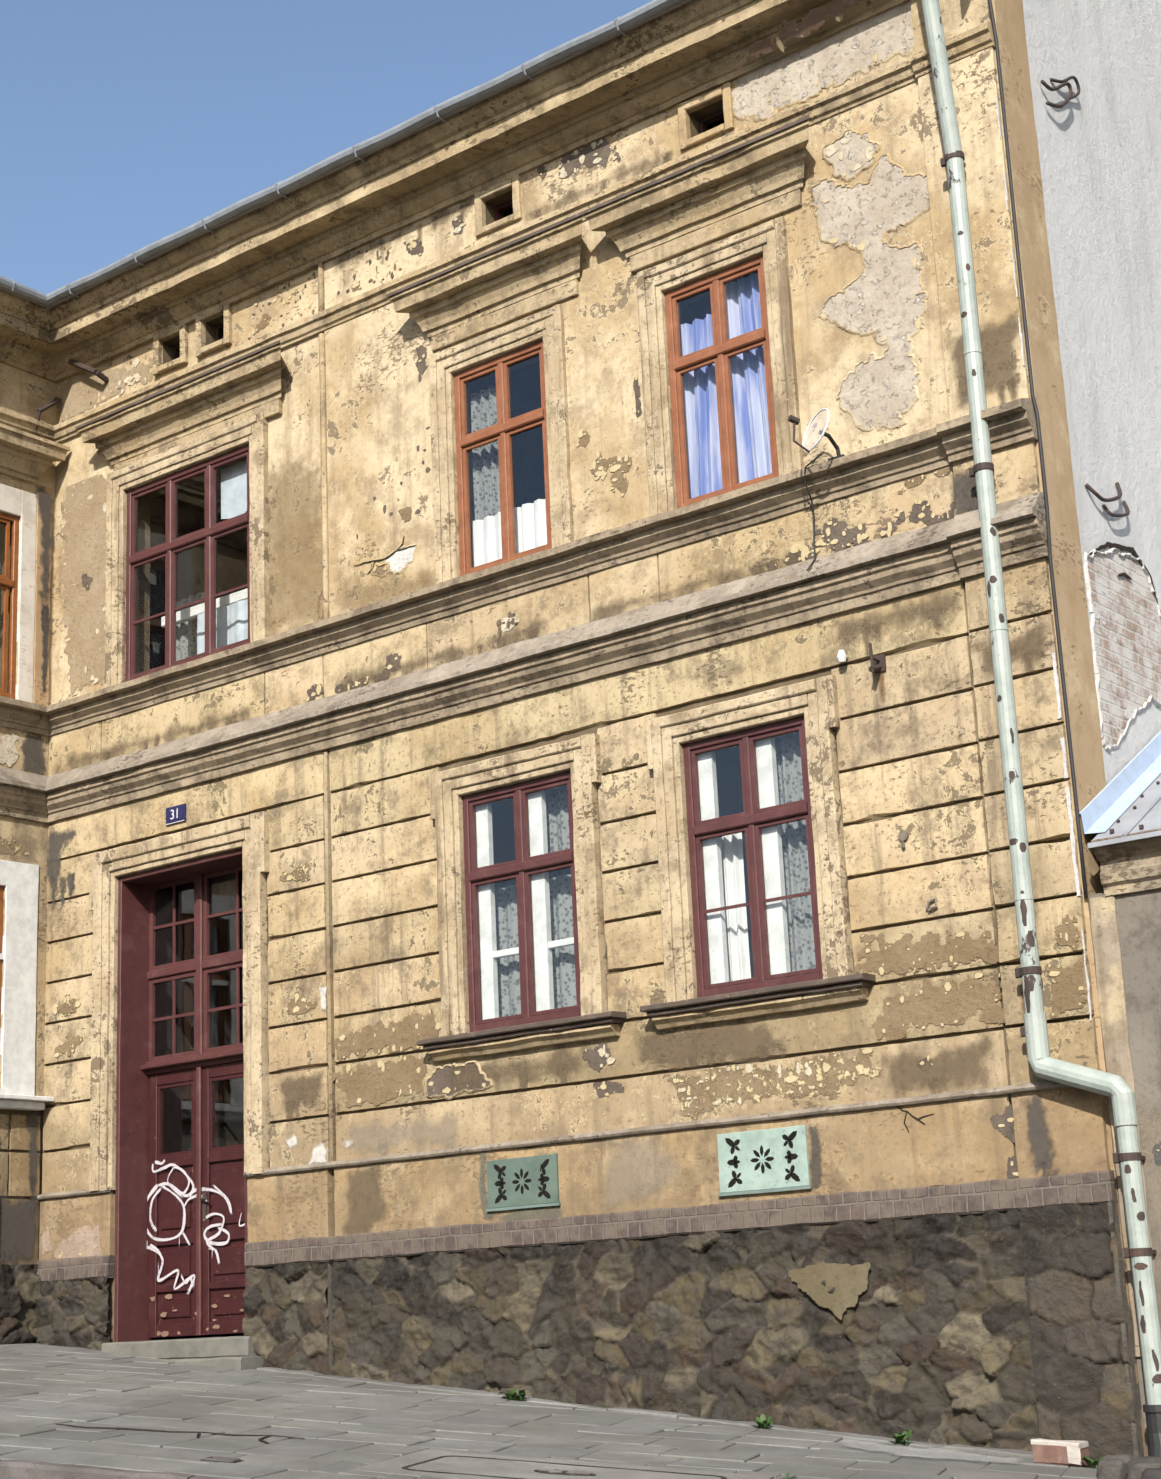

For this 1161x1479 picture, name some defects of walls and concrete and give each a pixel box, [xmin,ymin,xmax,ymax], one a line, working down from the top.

peeling [731,0,915,123]
peeling [537,138,621,179]
peeling [810,128,930,432]
peeling [576,429,639,497]
peeling [370,544,417,578]
peeling [765,465,957,570]
peeling [1083,547,1161,752]
peeling [332,1008,493,1107]
peeling [667,929,1005,1118]
damp [1027,1096,1057,1177]
peeling [1125,1164,1145,1221]
peeling [1134,1263,1161,1383]